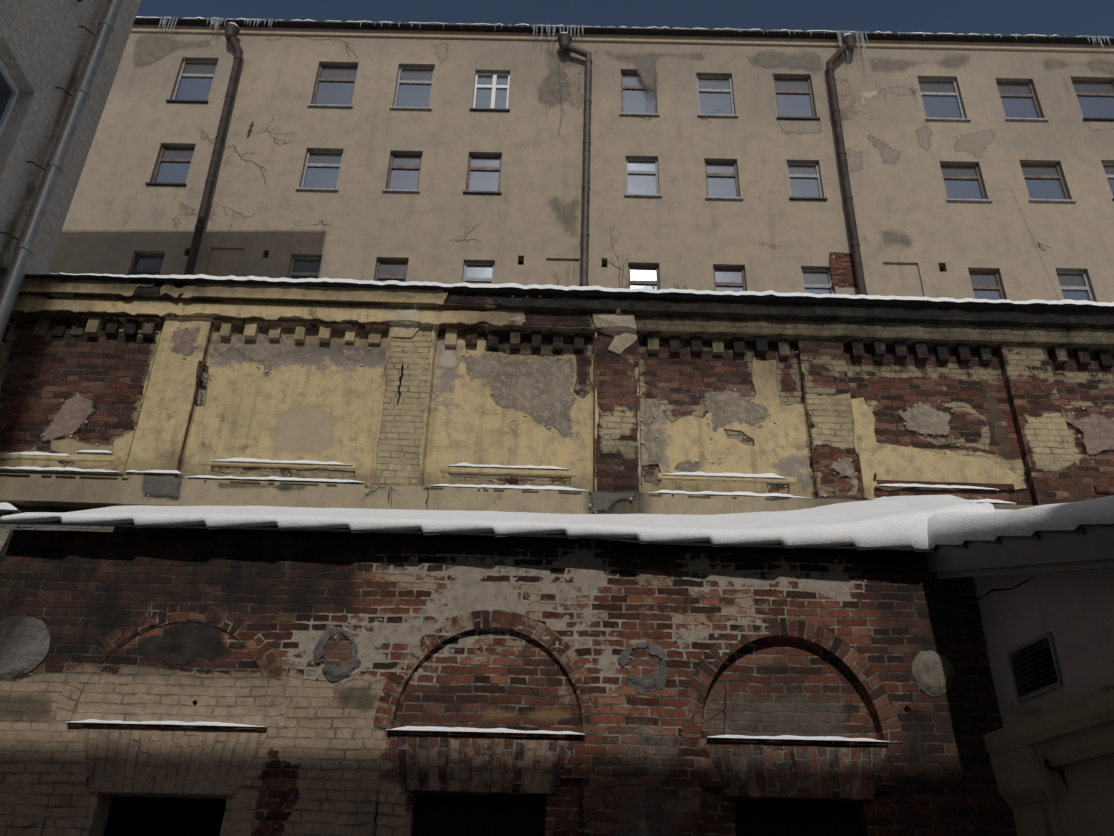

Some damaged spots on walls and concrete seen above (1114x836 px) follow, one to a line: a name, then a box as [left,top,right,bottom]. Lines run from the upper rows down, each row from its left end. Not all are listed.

crack [224,119,292,184]
spalling [0,288,157,468]
crack [396,363,404,406]
peeling [434,294,594,438]
spalling [638,335,777,445]
spalling [776,346,840,406]
crack [975,576,1034,602]
spalling [263,748,300,806]
crack [372,798,380,836]